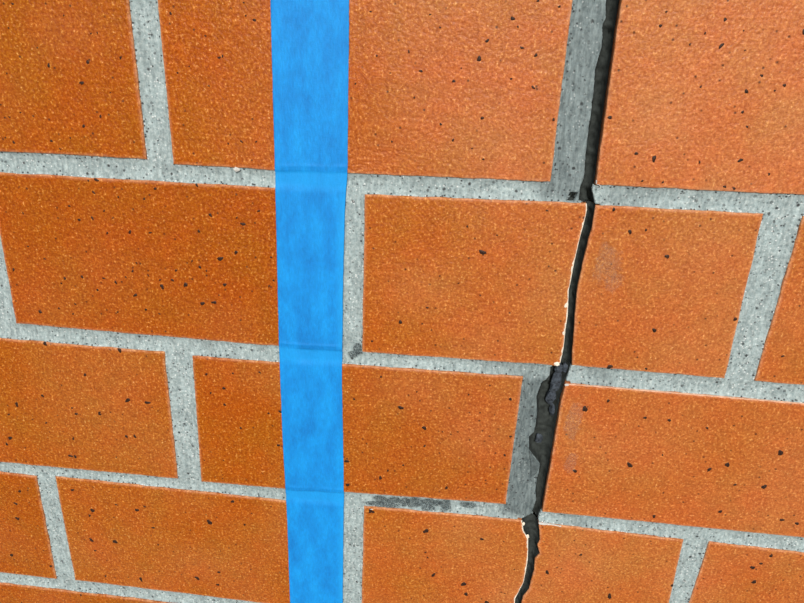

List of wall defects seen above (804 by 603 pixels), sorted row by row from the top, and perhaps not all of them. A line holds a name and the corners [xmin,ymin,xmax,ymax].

crack [515,0,619,603]